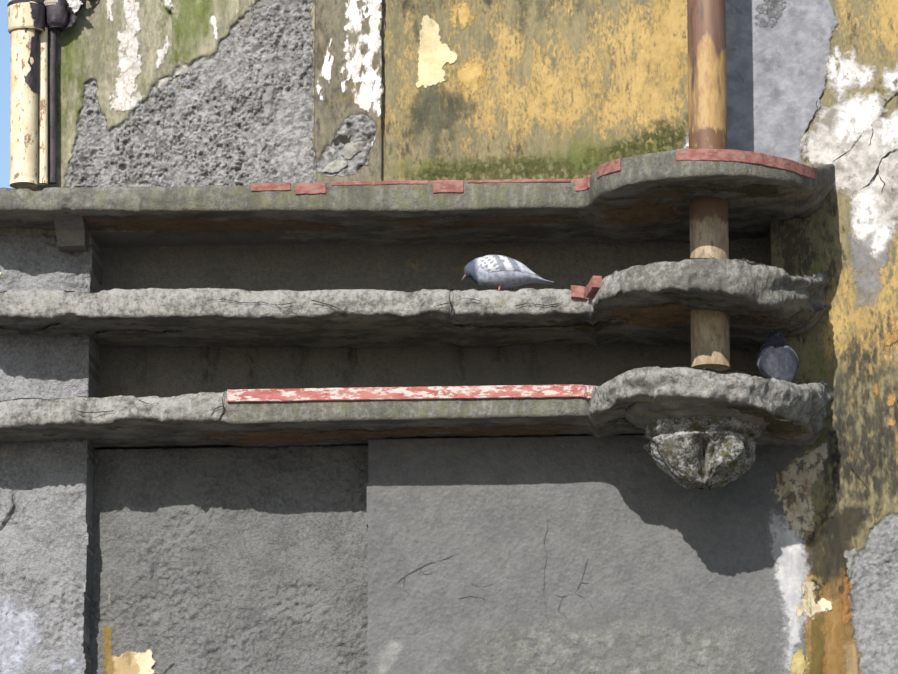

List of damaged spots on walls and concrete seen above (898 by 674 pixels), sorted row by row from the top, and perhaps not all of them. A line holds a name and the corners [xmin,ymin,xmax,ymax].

peeling [450,0,477,29]
peeling [755,0,786,28]
flaking render [64,0,384,188]
water stain [411,87,475,155]
peeling [416,15,486,94]
crack [833,92,898,194]
water stain [804,316,898,584]
peeling [769,443,832,674]
flaking render [844,513,898,674]
peeling [50,658,82,674]
peeling [103,625,156,674]